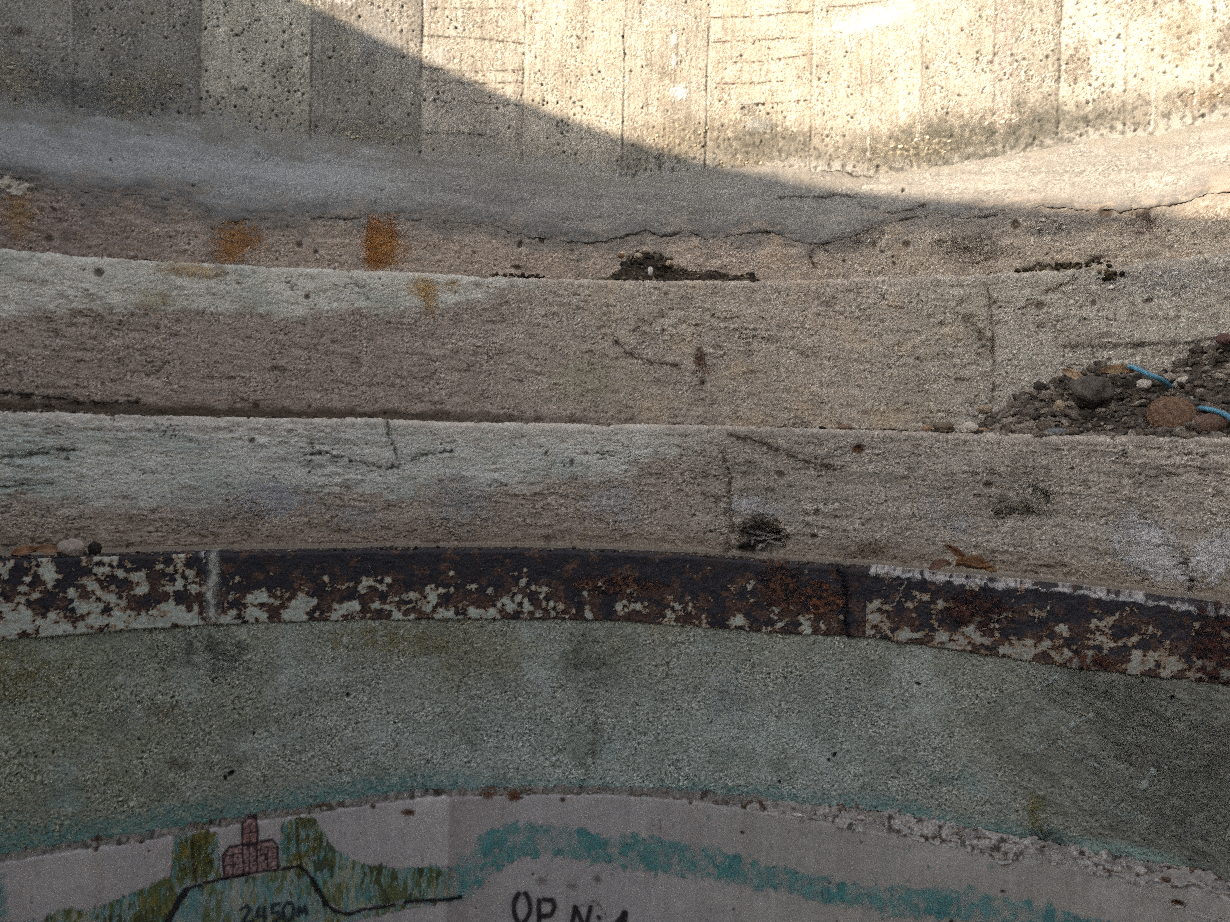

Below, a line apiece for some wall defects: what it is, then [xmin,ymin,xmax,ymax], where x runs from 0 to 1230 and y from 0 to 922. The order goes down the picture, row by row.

spalling [0,0,1230,604]
crack [0,390,140,406]
crack [0,447,75,488]
corrosion [1065,653,1109,672]
corrosion [1181,600,1230,686]
spalling [0,553,1230,922]